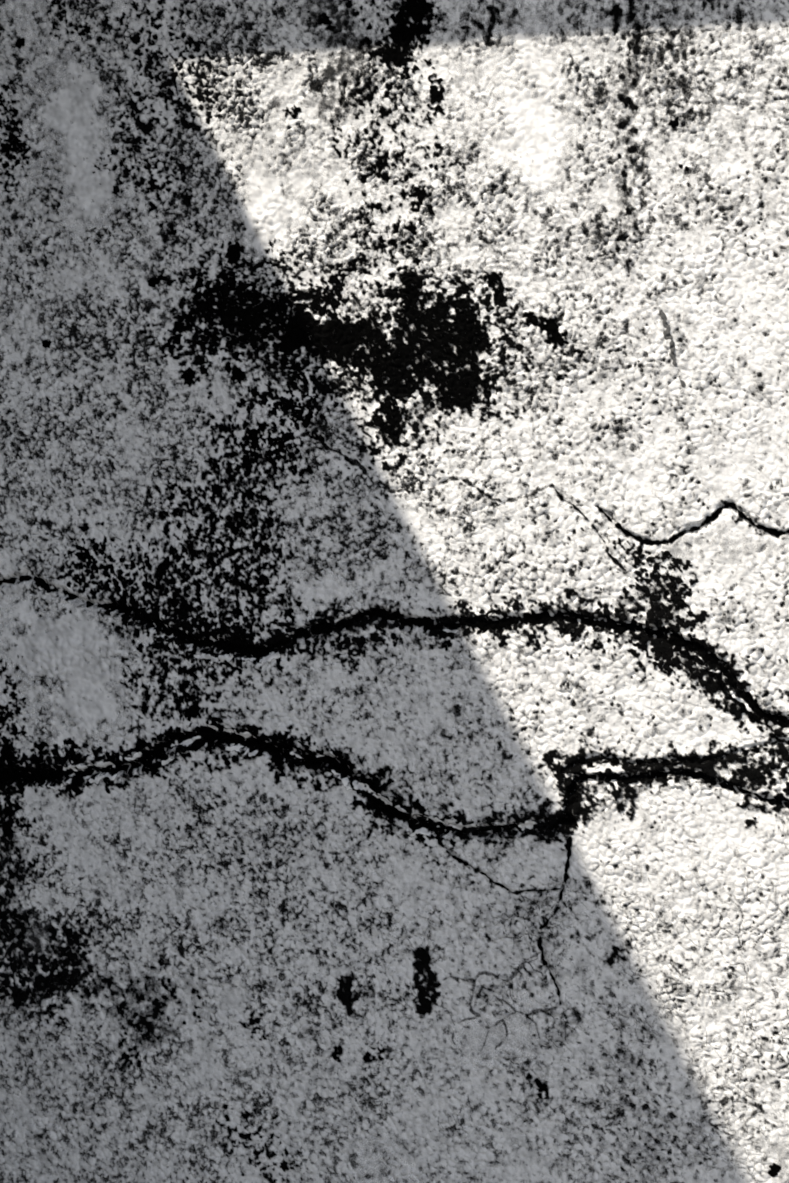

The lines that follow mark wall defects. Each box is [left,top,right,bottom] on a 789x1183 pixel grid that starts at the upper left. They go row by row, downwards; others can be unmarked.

damp [47,0,585,744]
crack [0,432,789,1050]